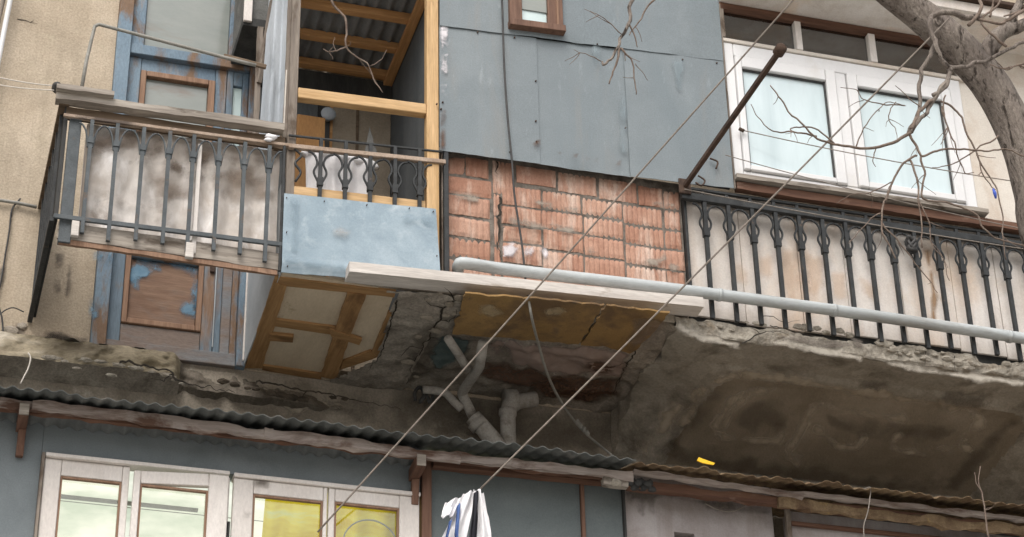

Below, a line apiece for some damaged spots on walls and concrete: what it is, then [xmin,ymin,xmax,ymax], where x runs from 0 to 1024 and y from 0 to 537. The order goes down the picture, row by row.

crack [495,161,503,255]
peeling [130,259,197,316]
crack [119,359,400,409]
crack [367,287,464,384]
peeling [414,292,469,369]
peeling [491,340,627,377]
peeling [677,319,767,347]
leakage [643,370,928,455]
peeling [778,342,860,359]
spalling [874,339,1024,385]